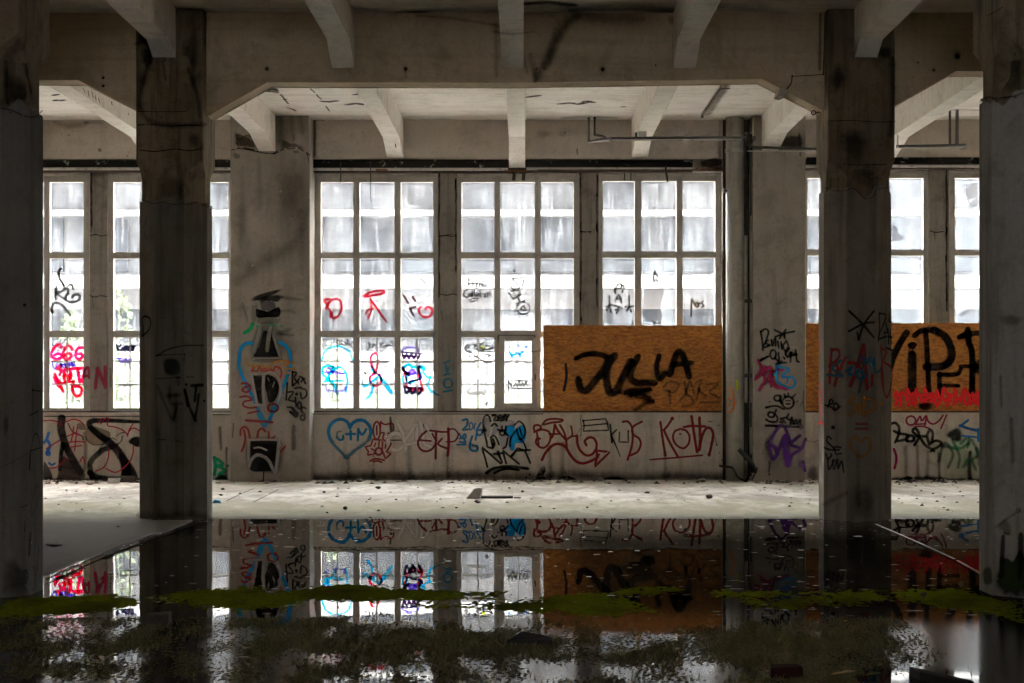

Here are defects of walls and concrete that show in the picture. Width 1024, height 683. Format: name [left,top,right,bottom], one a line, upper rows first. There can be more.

damp [880,48,895,137]
flaking render [232,133,310,162]